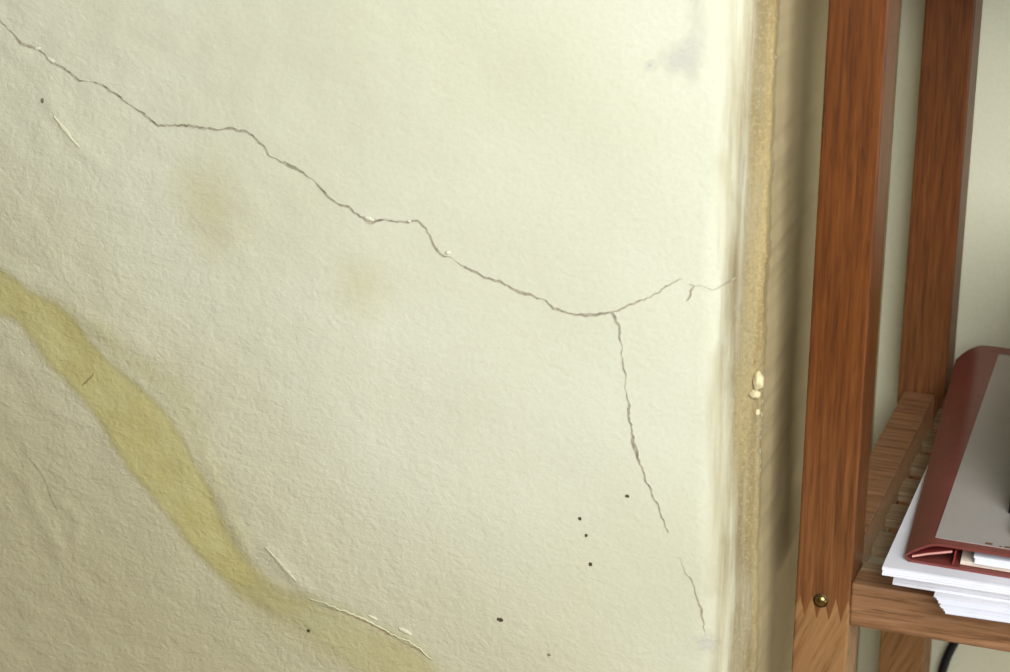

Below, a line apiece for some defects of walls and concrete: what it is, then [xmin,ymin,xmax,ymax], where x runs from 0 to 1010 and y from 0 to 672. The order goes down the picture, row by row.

water stain [0,271,428,672]
crack [0,20,736,533]
crack [680,559,706,636]